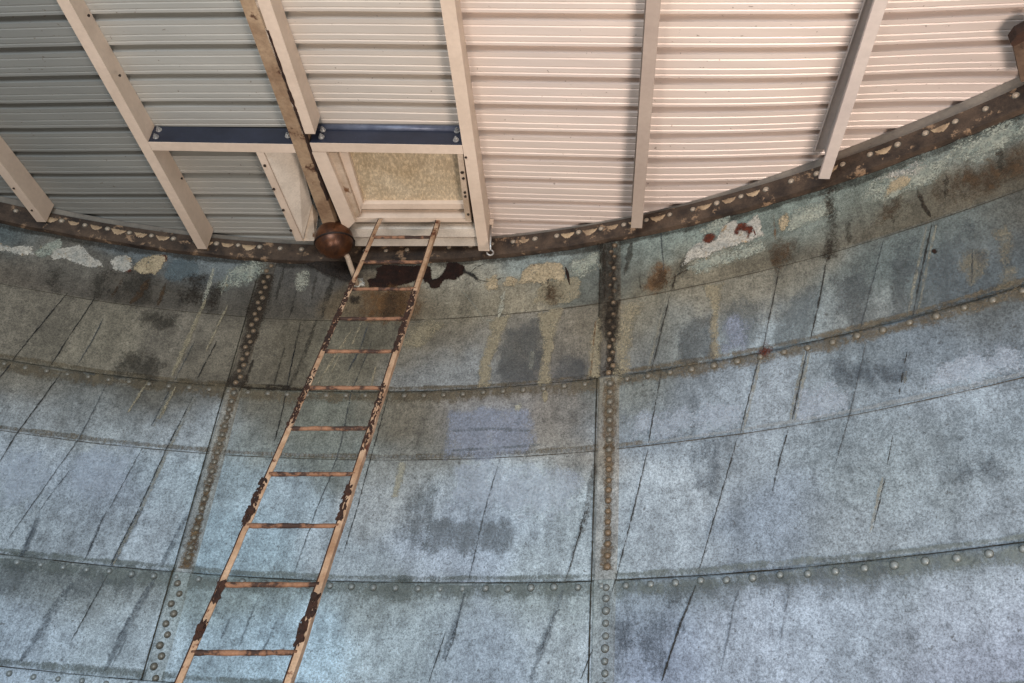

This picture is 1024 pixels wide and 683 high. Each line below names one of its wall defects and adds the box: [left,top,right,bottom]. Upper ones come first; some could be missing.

peeling [0,239,167,275]
rust [350,286,420,322]
rust [734,223,756,237]
peeling [682,197,834,274]
crack [772,255,828,491]
crack [341,398,388,560]
crack [661,267,780,681]
crack [870,436,893,532]
crack [429,466,498,681]